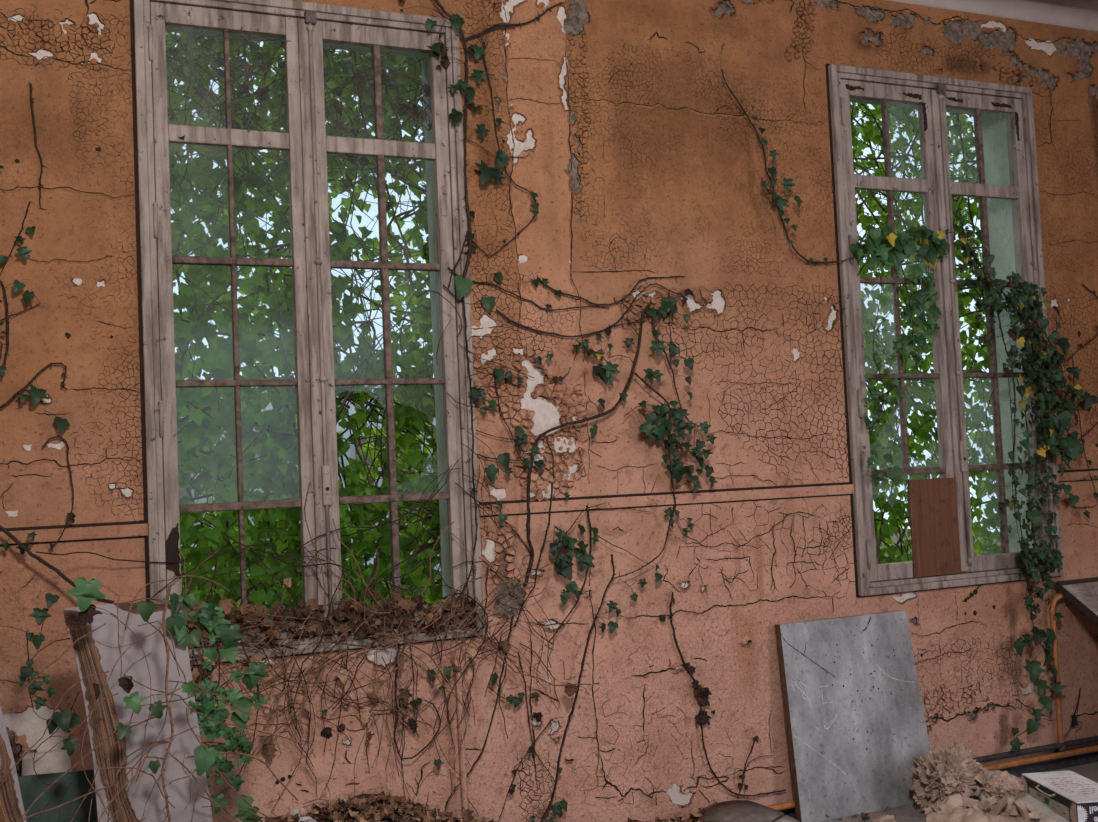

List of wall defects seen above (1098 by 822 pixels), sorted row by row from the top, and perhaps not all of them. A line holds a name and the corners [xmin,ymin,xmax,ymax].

peeling [27,46,57,63]
peeling [59,11,107,35]
spalling [853,4,1098,99]
peeling [493,96,538,165]
spalling [557,56,584,223]
crack [0,0,144,521]
peeling [679,286,727,317]
peeling [472,313,498,364]
peeling [511,345,584,501]
crack [463,0,1098,822]
spalling [487,483,506,501]
spalling [481,536,498,565]